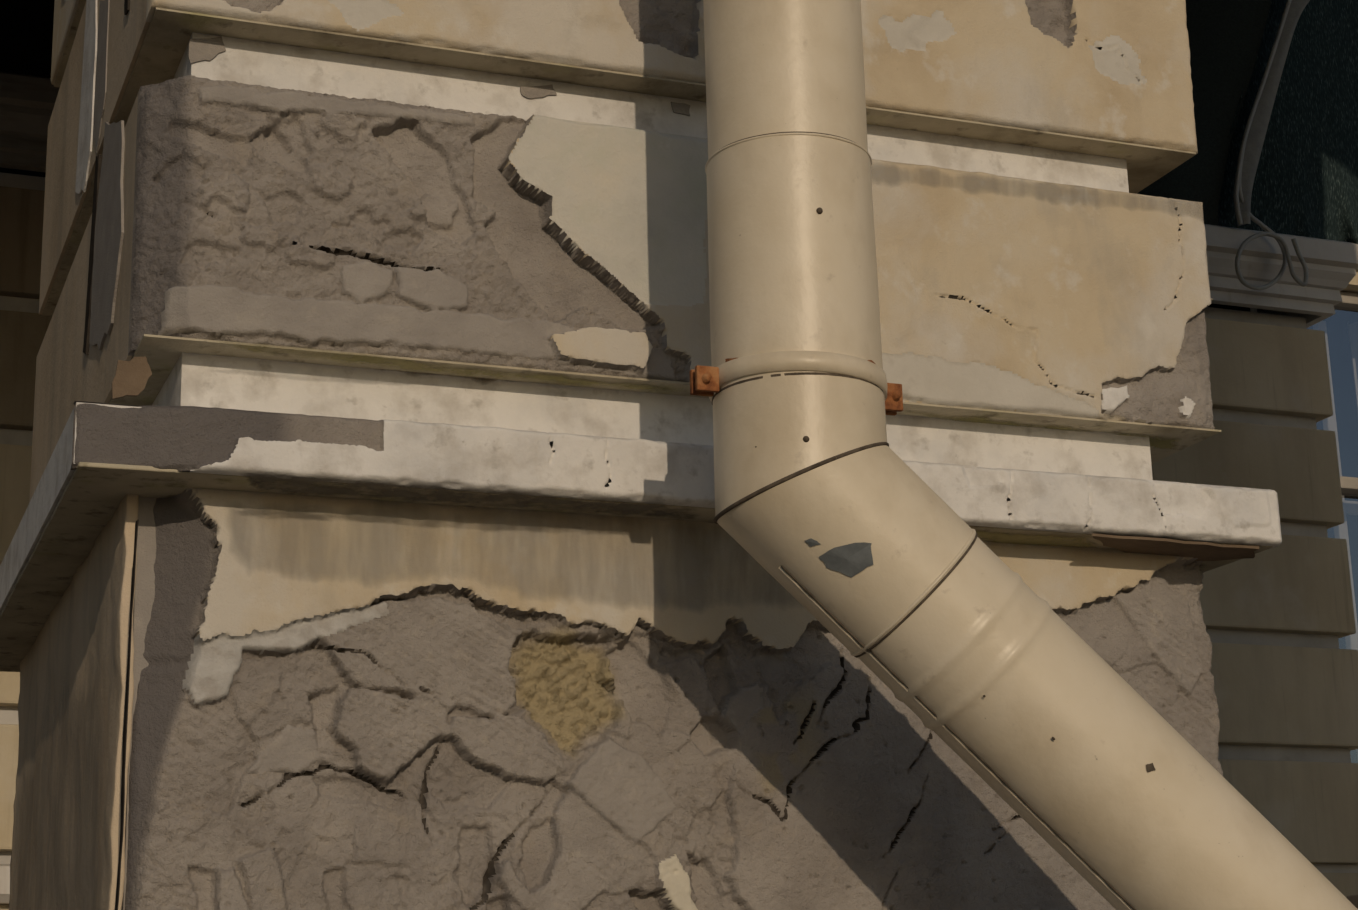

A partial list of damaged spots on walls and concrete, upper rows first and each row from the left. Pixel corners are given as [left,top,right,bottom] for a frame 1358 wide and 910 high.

peeling [878,10,957,52]
peeling [1025,0,1147,85]
flaking render [70,0,708,472]
peeling [882,302,1215,429]
crack [321,645,378,664]
flaking render [1052,533,1259,776]
flaking render [121,489,1116,910]
crack [752,657,872,822]
crack [241,747,439,835]
crack [470,832,515,910]
crack [890,807,916,848]